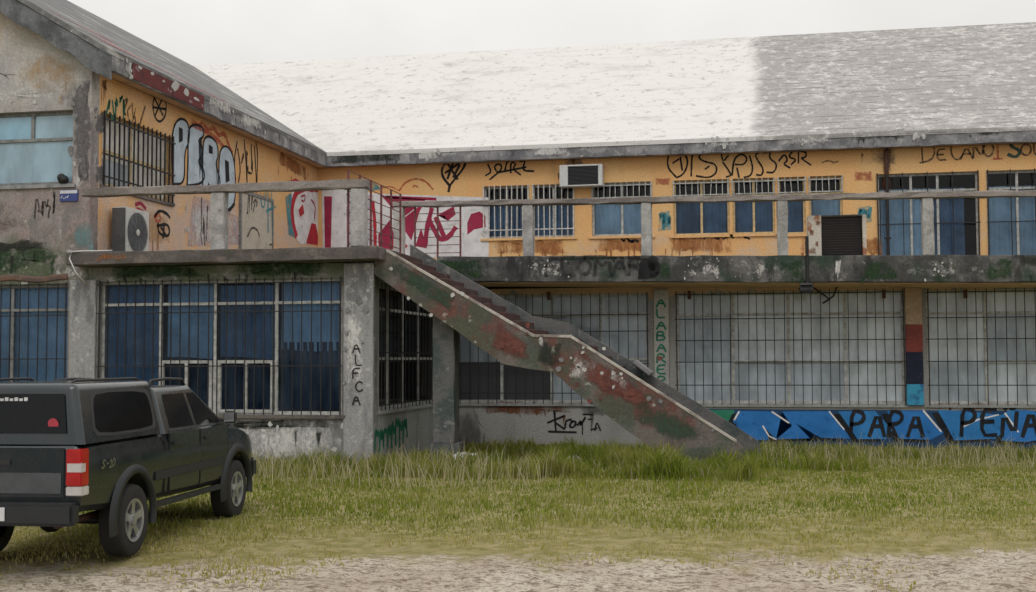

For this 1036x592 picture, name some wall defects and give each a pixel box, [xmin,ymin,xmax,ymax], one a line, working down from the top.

water stain [0,240,42,273]